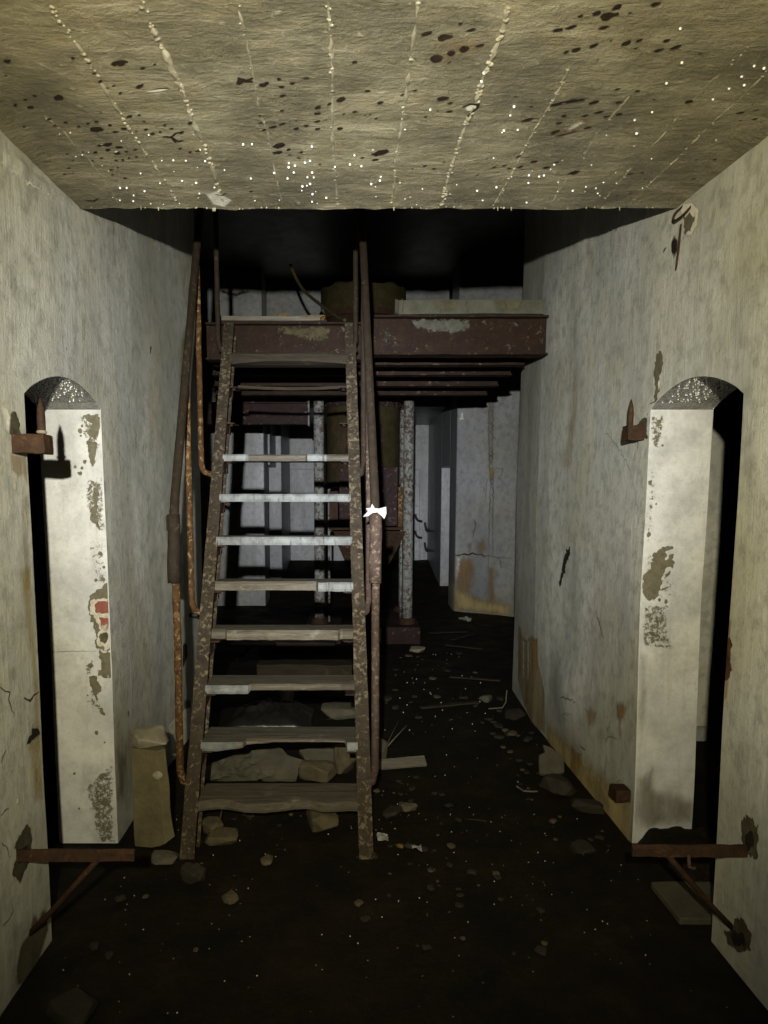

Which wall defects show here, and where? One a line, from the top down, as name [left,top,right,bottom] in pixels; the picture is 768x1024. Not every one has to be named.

damp [45,1,283,211]
efflorescence [325,0,339,206]
damp [390,1,511,209]
damp [493,66,570,211]
damp [585,71,767,211]
spalling [663,203,699,256]
spalling [73,414,111,715]
crack [455,401,511,570]
peeling [642,472,675,648]
flaking render [12,824,32,883]
peeling [78,766,115,842]
flaking render [741,815,759,860]